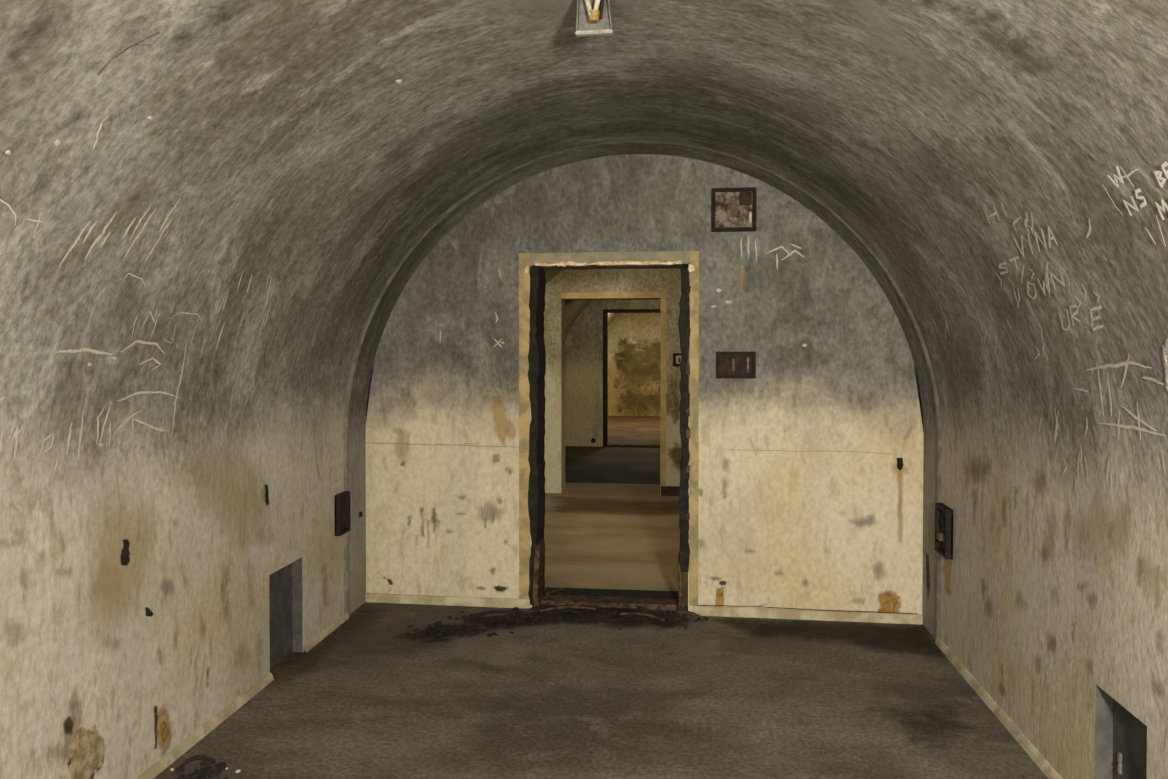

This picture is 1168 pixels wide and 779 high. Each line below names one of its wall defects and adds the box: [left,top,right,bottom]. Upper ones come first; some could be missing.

corrosion [878,592,900,614]
flaking render [57,698,105,779]